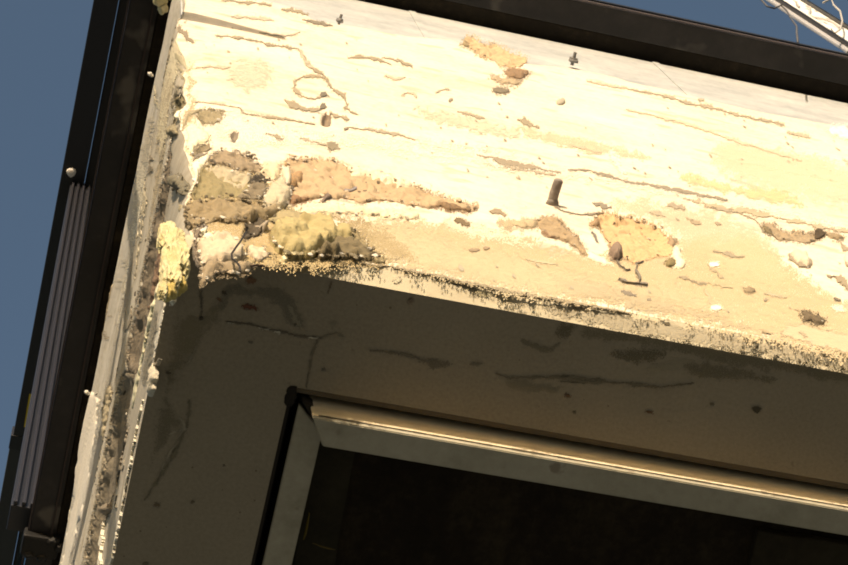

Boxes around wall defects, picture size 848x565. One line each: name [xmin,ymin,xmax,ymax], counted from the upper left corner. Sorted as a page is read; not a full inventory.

crack [347,54,451,98]
spalling [459,32,531,96]
crack [133,0,416,282]
crack [457,111,485,119]
spalling [509,210,690,271]
spalling [760,221,847,245]
spalling [81,38,479,565]
crack [226,321,344,390]
crack [495,373,694,390]